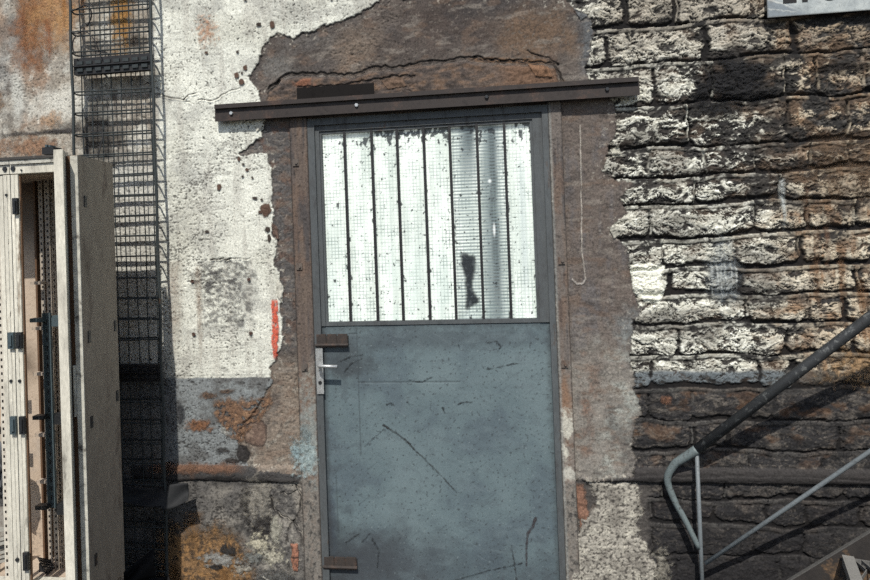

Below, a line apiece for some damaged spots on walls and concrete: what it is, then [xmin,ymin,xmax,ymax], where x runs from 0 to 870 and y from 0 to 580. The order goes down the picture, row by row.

flaking render [234,0,594,101]
flaking render [188,97,670,580]